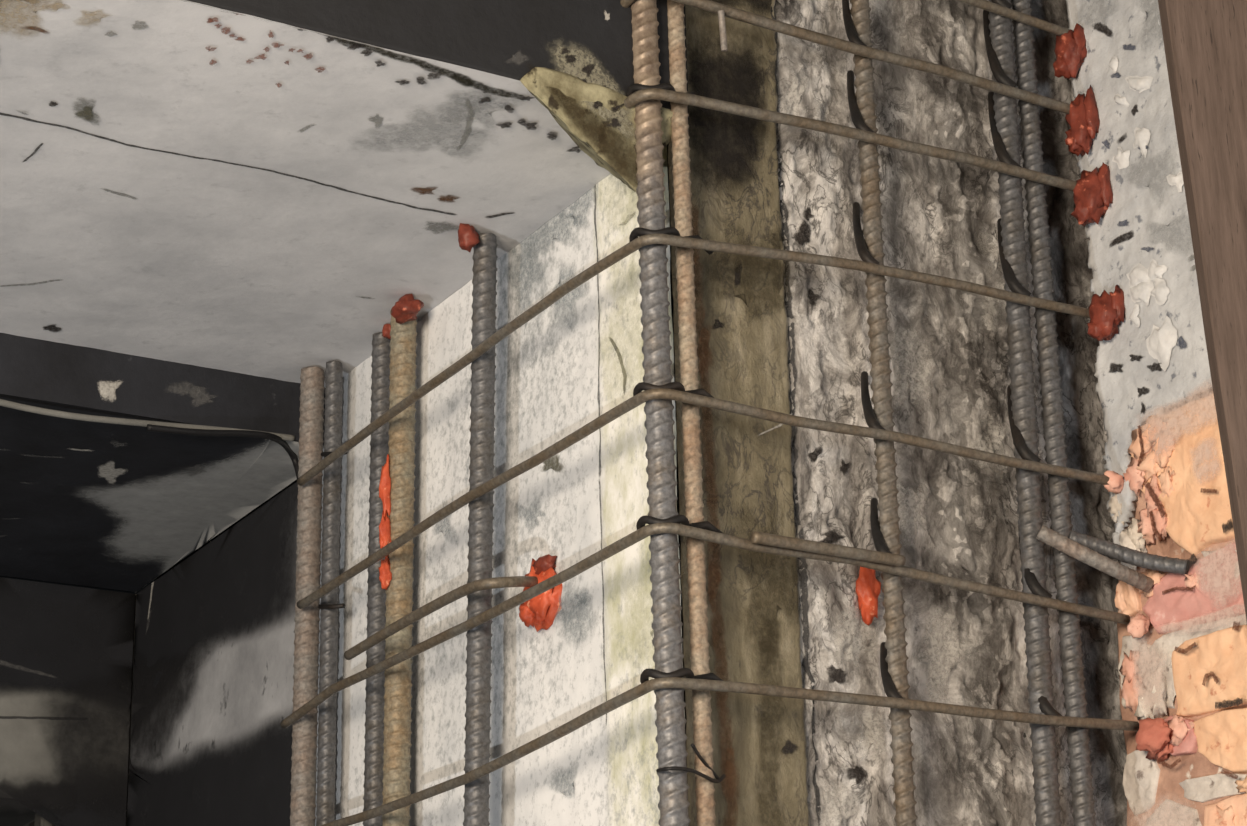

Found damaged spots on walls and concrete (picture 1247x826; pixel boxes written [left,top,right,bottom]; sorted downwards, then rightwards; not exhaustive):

corrosion [0,0,64,33]
corrosion [207,17,244,41]
crack [0,113,456,215]
corrosion [246,30,325,73]
water stain [551,87,637,179]
water stain [688,38,765,187]
water stain [711,0,794,13]
spalling [554,0,716,826]
spalling [988,0,1097,826]
spalling [363,294,424,826]
spalling [458,223,498,826]
spalling [1107,385,1247,826]